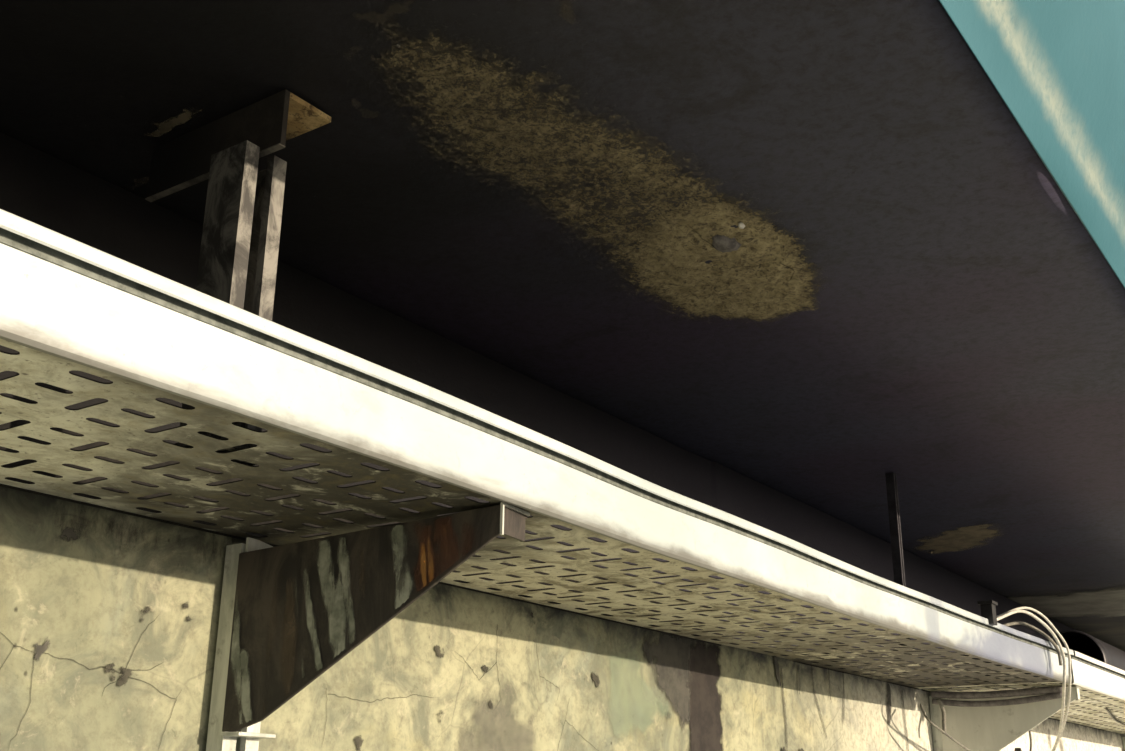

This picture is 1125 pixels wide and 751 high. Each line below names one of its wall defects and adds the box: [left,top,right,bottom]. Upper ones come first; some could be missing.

spalling [377,26,824,322]
spalling [917,524,1002,554]
damp [643,633,723,751]